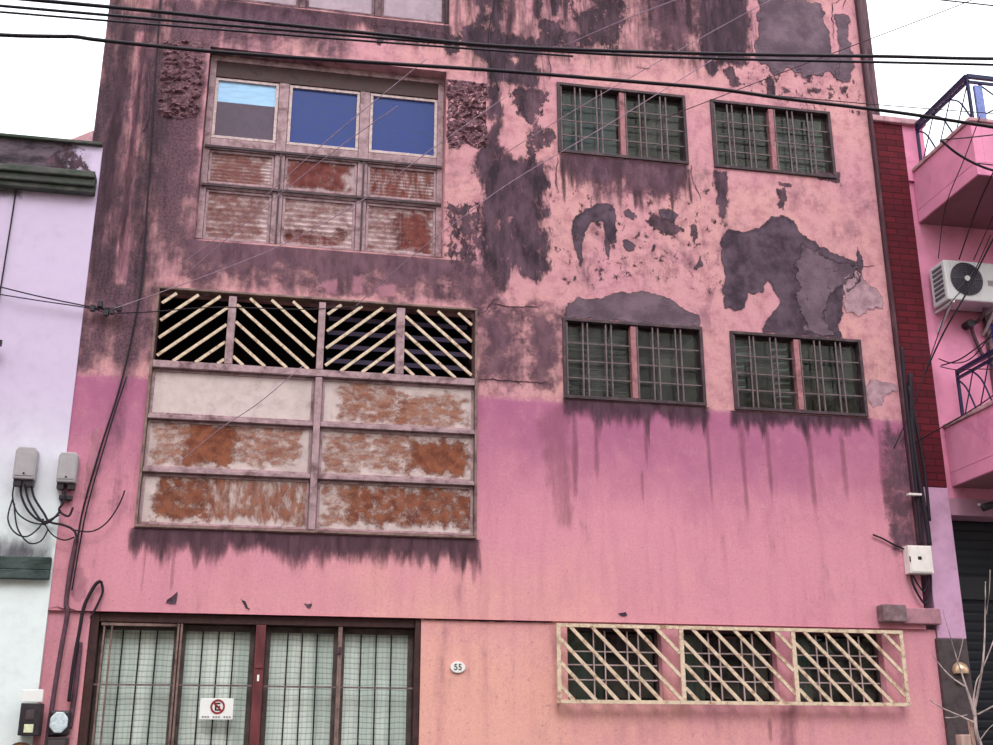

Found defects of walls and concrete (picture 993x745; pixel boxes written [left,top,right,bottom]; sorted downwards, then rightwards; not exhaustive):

leakage [647,0,865,115]
peeling [754,0,855,98]
flaking render [446,79,487,150]
corrosion [206,153,267,241]
corrosion [284,160,351,247]
corrosion [367,167,436,254]
leakage [184,0,729,389]
peeling [564,291,701,327]
peeling [720,215,884,338]
corrosion [150,383,470,531]
leakage [563,399,708,434]
leakage [130,527,480,571]